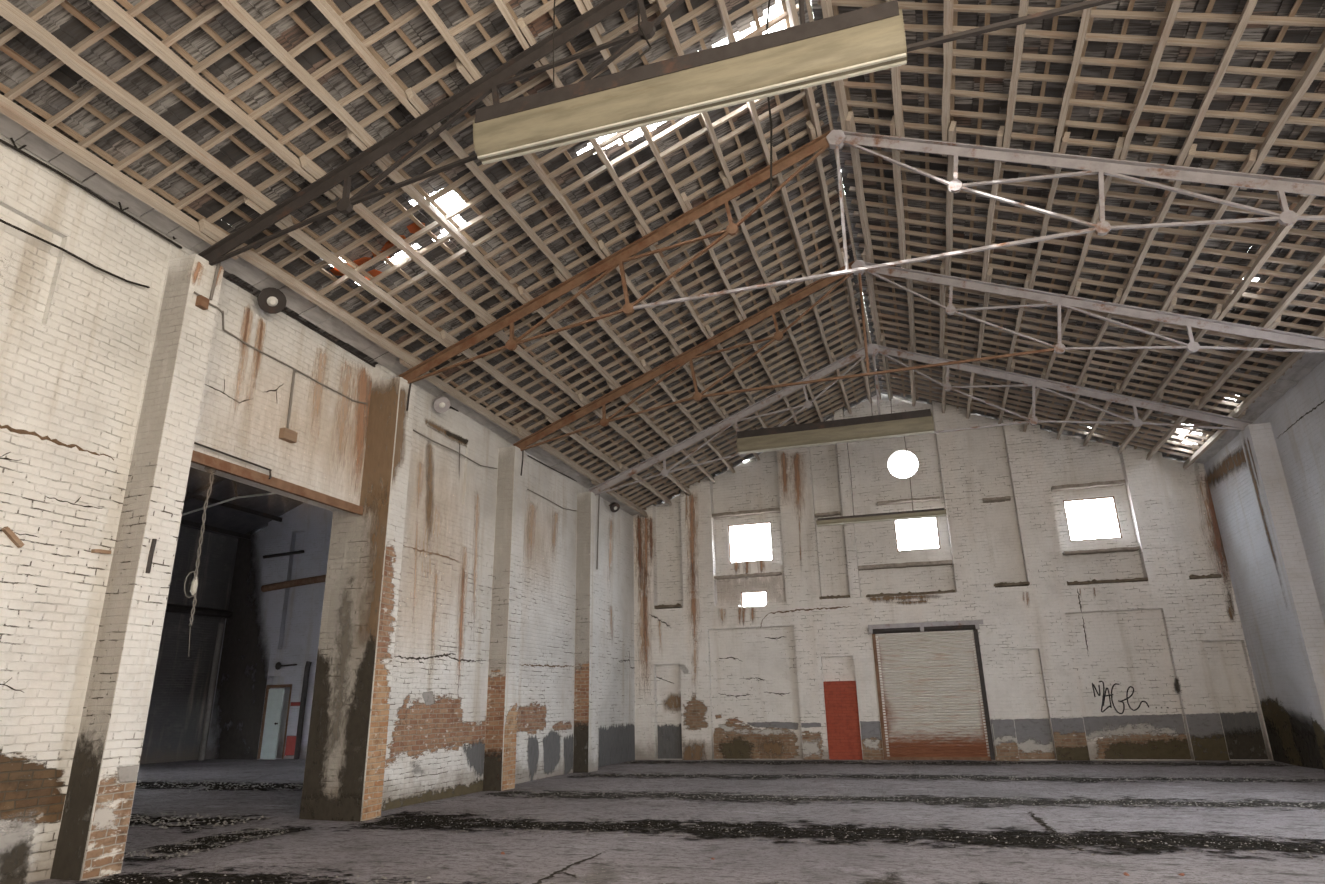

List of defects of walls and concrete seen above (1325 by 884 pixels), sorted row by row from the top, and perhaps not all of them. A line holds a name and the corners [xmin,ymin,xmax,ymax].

corrosion [243,311,263,373]
crack [0,425,114,461]
corrosion [355,369,372,471]
flaking render [392,389,406,481]
corrosion [637,517,652,672]
flaking render [299,539,486,822]
flaking render [0,749,66,826]
flaking render [82,765,139,881]
flaking render [502,701,572,791]
flaking render [682,695,824,760]